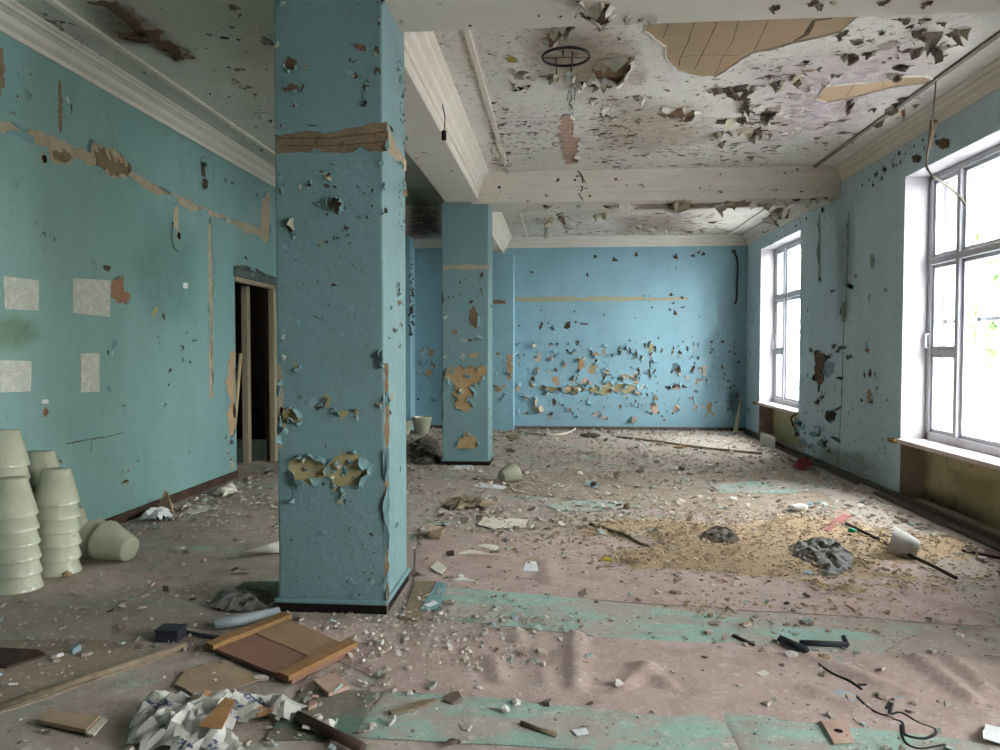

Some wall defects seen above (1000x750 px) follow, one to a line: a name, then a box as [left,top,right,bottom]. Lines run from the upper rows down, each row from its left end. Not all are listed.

peeling [489,56,636,167]
spalling [549,1,972,167]
peeling [102,264,131,305]
peeling [200,162,209,190]
peeling [283,218,296,250]
peeling [748,186,836,246]
peeling [213,351,236,468]
peeling [288,350,401,612]
peeling [454,430,492,452]
peeling [416,273,753,423]
peeling [793,344,889,453]